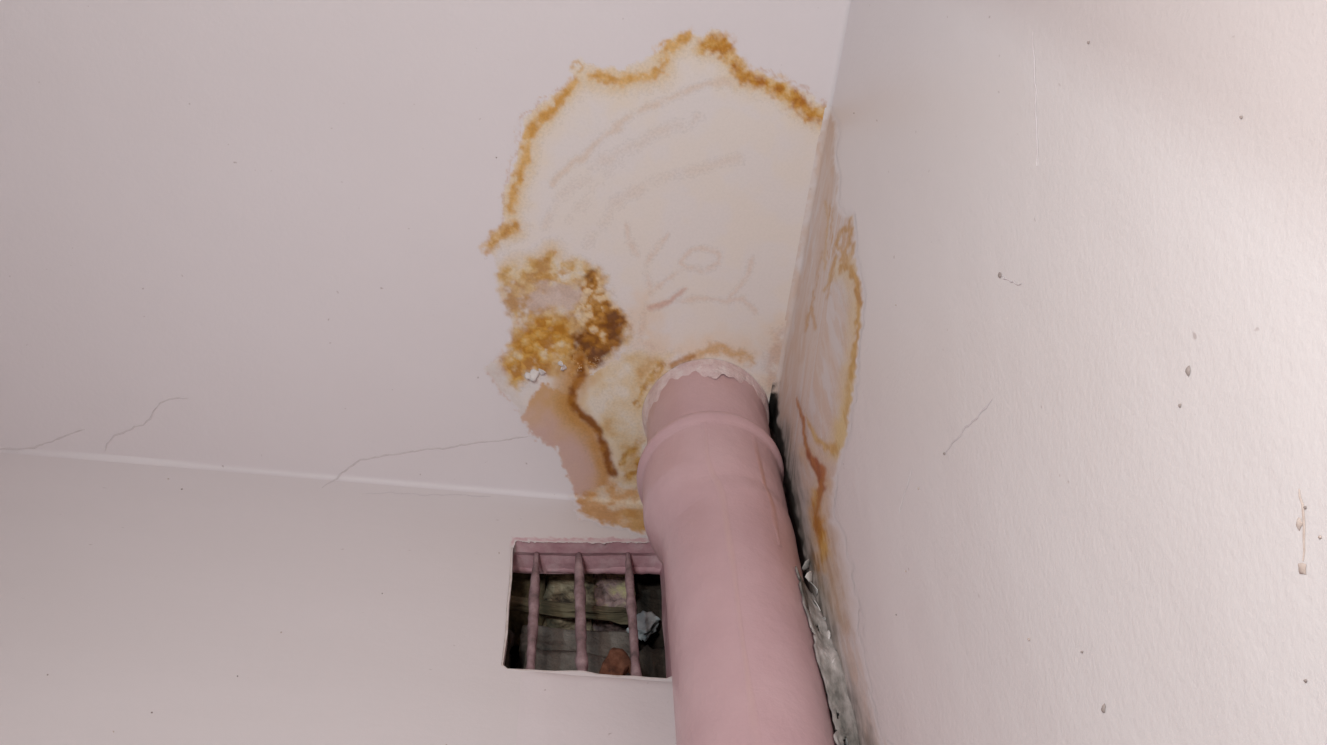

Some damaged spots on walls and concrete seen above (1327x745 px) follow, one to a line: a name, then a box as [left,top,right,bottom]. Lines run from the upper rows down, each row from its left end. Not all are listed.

leakage [476,24,884,745]